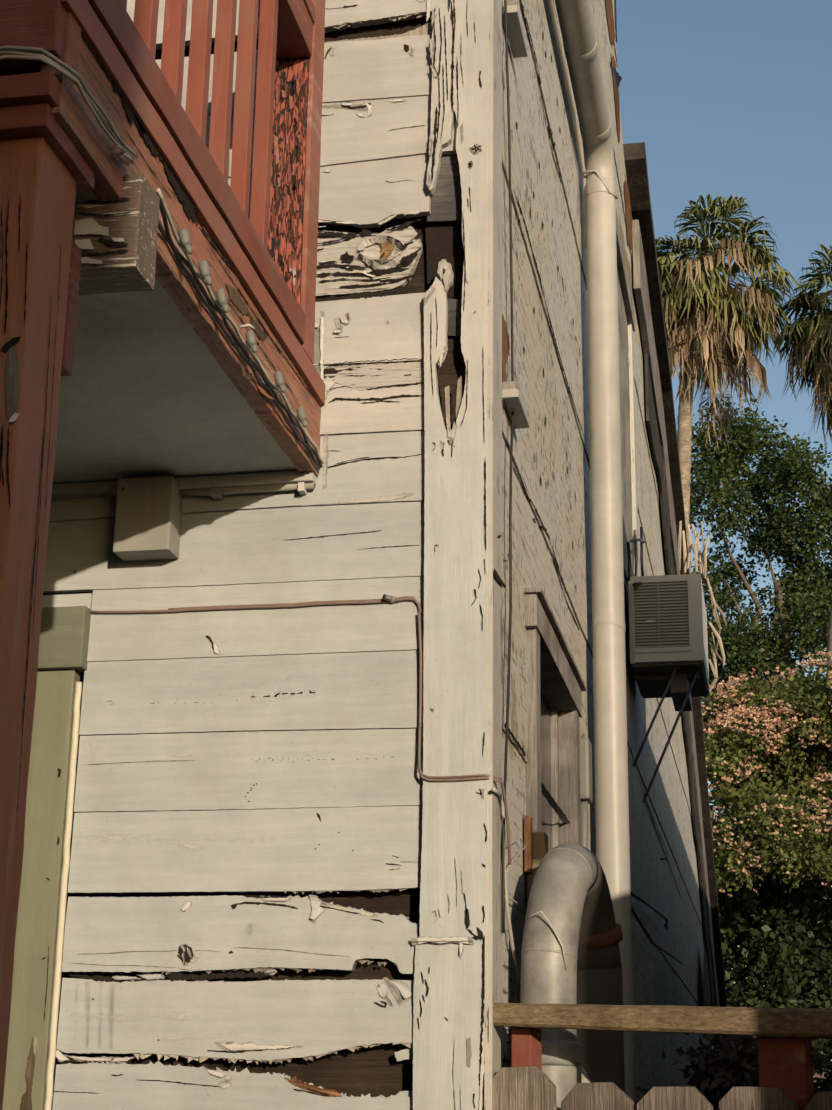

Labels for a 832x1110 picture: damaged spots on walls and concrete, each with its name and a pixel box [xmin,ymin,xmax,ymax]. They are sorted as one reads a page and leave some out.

peeling [271,71,304,295]
peeling [74,203,124,264]
crack [232,895,384,923]
crack [74,947,350,968]
peeling [20,1032,38,1110]
crack [53,1074,233,1094]